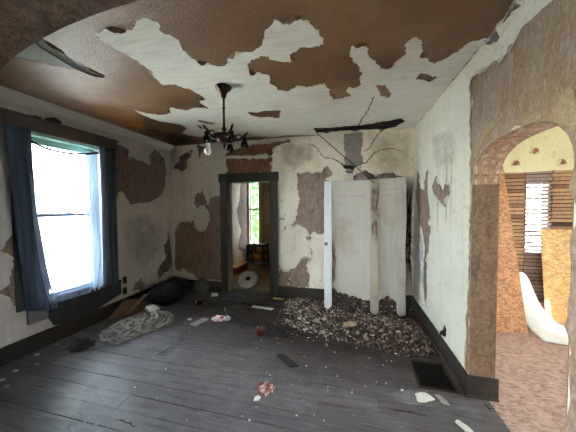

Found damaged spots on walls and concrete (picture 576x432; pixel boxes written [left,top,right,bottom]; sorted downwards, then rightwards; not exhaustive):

peeling [93,0,526,174]
flaking render [0,236,16,308]
flaking render [115,145,166,204]
flaking render [157,189,221,282]
flaking render [278,248,313,288]
flaking render [278,166,334,241]
crack [363,131,397,164]
flaking render [415,170,450,309]